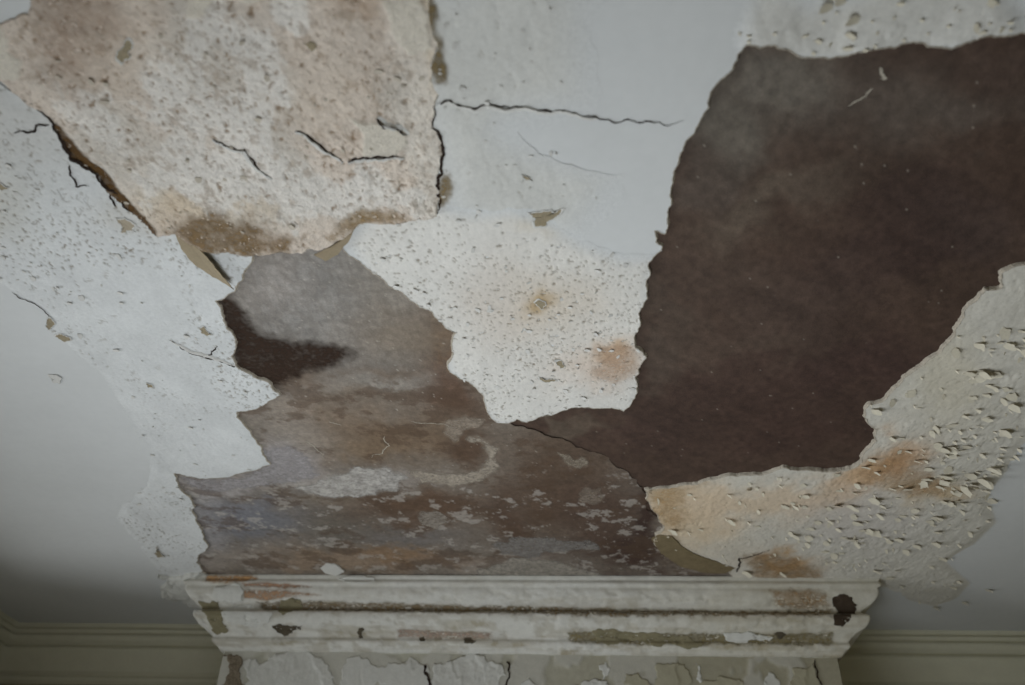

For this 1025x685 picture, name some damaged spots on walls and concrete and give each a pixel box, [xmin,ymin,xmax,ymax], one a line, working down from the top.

spalling [115,37,135,66]
crack [212,140,272,180]
crack [295,100,682,214]
spalling [173,0,1025,611]
peeling [0,81,279,580]
peeling [272,598,303,636]
peeling [592,628,704,650]
peeling [223,638,506,685]
peeling [581,662,610,685]
peeling [624,663,744,685]